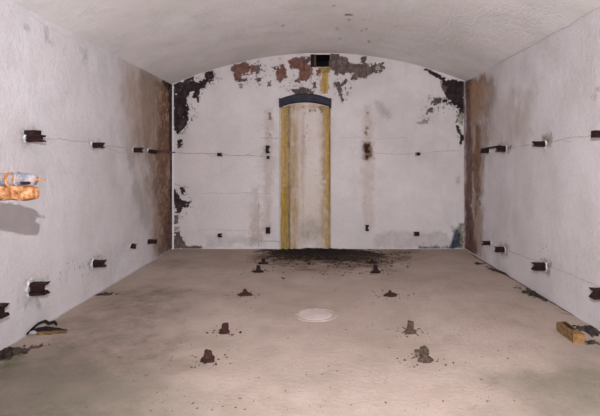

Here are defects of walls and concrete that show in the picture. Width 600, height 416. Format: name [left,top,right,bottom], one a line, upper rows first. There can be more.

peeling [173,71,222,149]
peeling [231,56,320,94]
peeling [329,53,385,104]
peeling [417,68,464,147]
peeling [174,180,203,249]